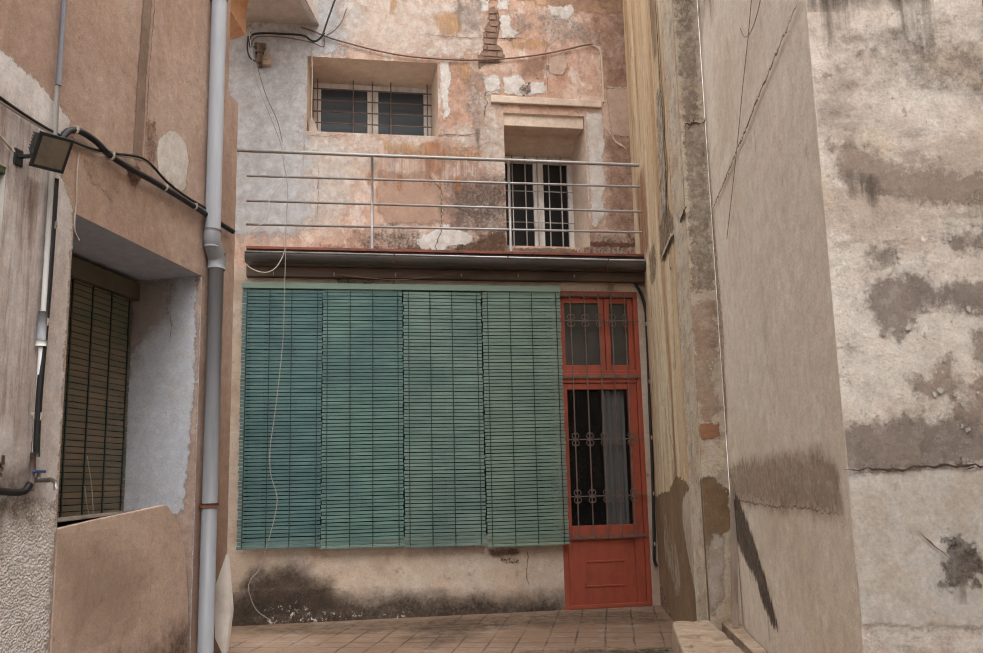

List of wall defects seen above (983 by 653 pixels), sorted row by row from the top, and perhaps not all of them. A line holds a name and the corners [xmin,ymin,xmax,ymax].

spalling [469,0,507,69]
crack [655,0,706,270]
water stain [674,0,701,122]
crack [710,0,798,215]
water stain [828,128,983,209]
peeling [0,49,74,510]
water stain [328,224,432,250]
spalling [649,84,721,440]
water stain [845,412,983,476]
water stain [232,565,564,626]
water stain [655,453,838,632]
water stain [937,537,983,593]